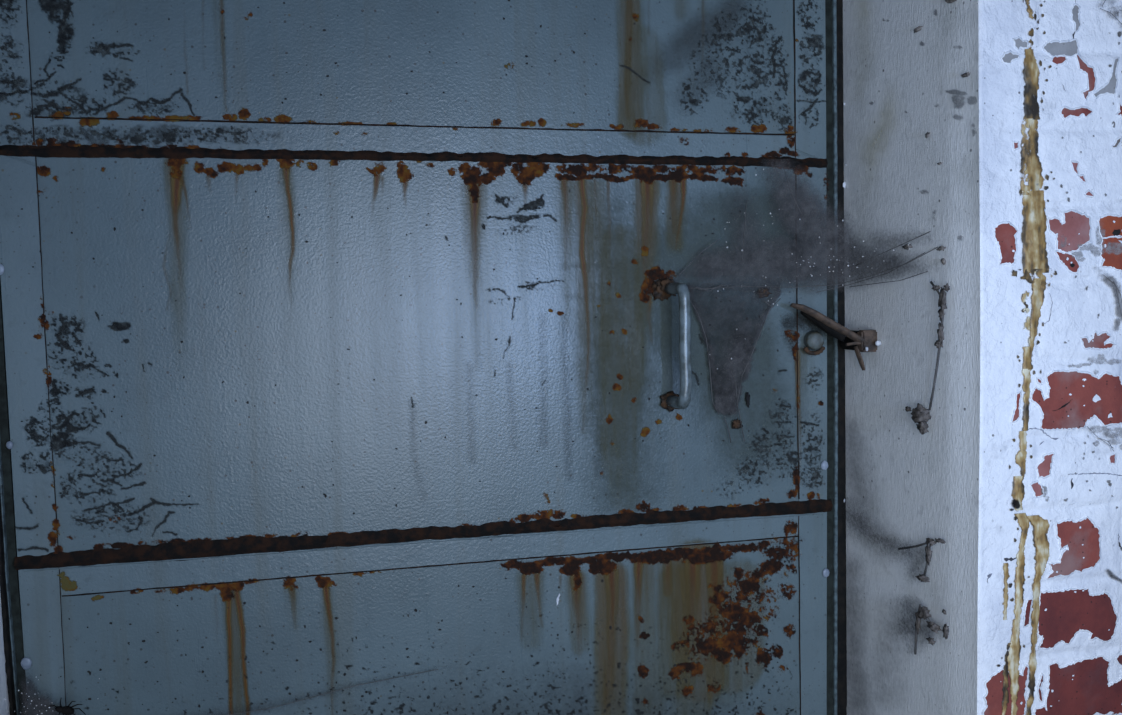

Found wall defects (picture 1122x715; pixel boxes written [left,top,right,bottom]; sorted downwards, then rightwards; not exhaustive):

damp [681,0,827,129]
rust [23,138,340,267]
rust [366,161,434,196]
rust [448,125,830,313]
peeling [993,221,1018,266]
peeling [1047,209,1122,274]
damp [21,313,198,536]
damp [997,0,1057,715]
peeling [1030,452,1055,499]
peeling [1010,369,1122,431]
rust [501,519,802,701]
peeling [982,516,1122,715]